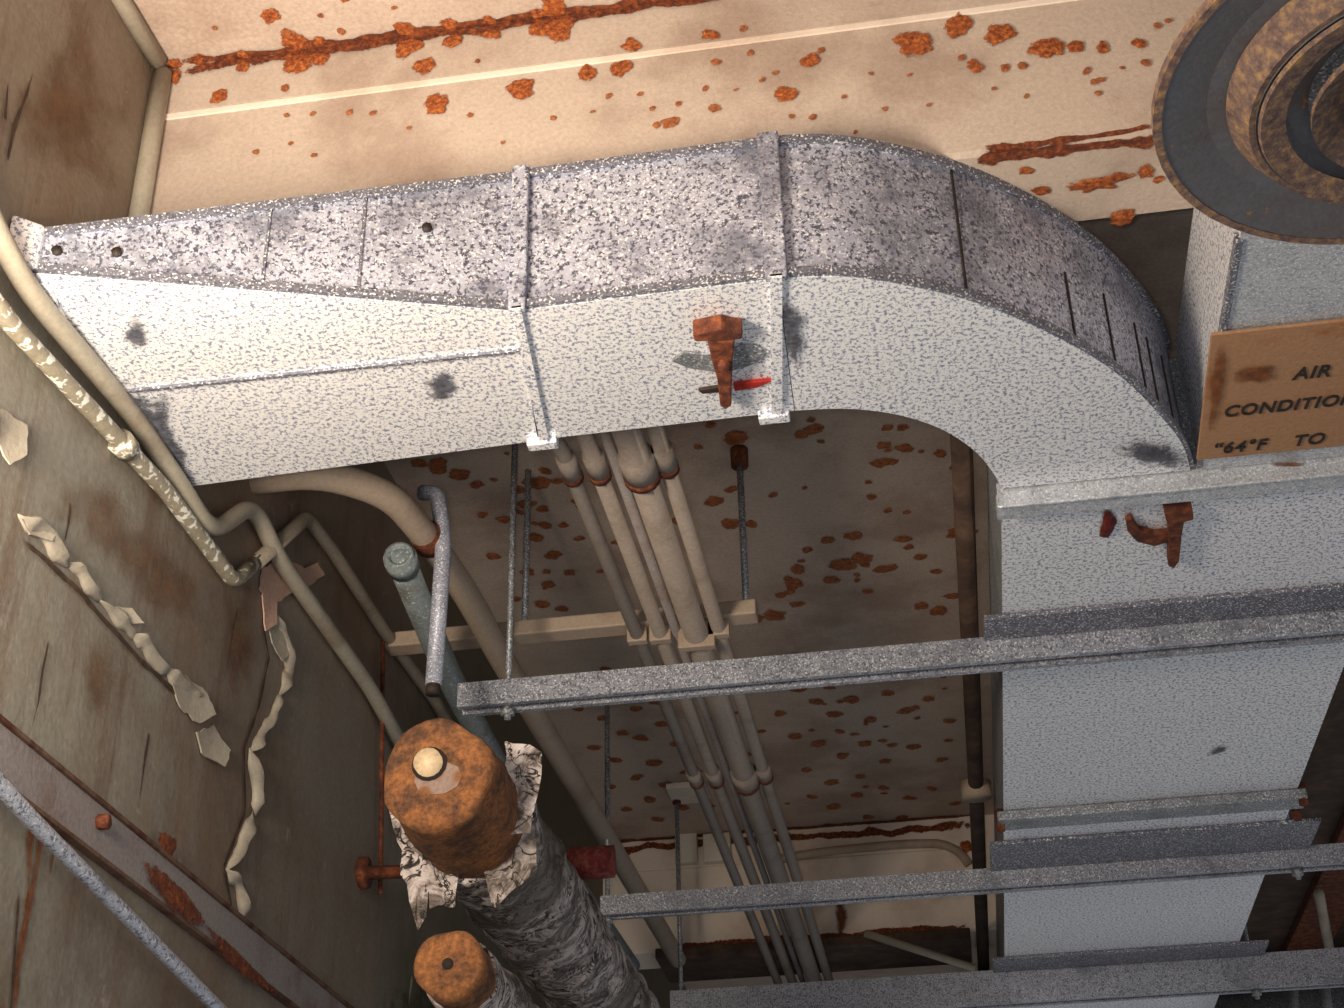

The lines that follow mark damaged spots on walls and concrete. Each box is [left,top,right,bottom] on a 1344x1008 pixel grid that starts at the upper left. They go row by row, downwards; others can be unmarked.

corrosion [423,93,448,114]
corrosion [166,0,716,92]
corrosion [505,79,534,100]
corrosion [892,12,1018,57]
corrosion [978,0,1344,245]
flaking render [0,408,28,465]
peeling [292,562,325,586]
corrosion [477,460,680,612]
peeling [17,514,296,917]
corrosion [0,714,354,1008]
corrosion [566,770,774,879]
corrosion [773,775,972,853]